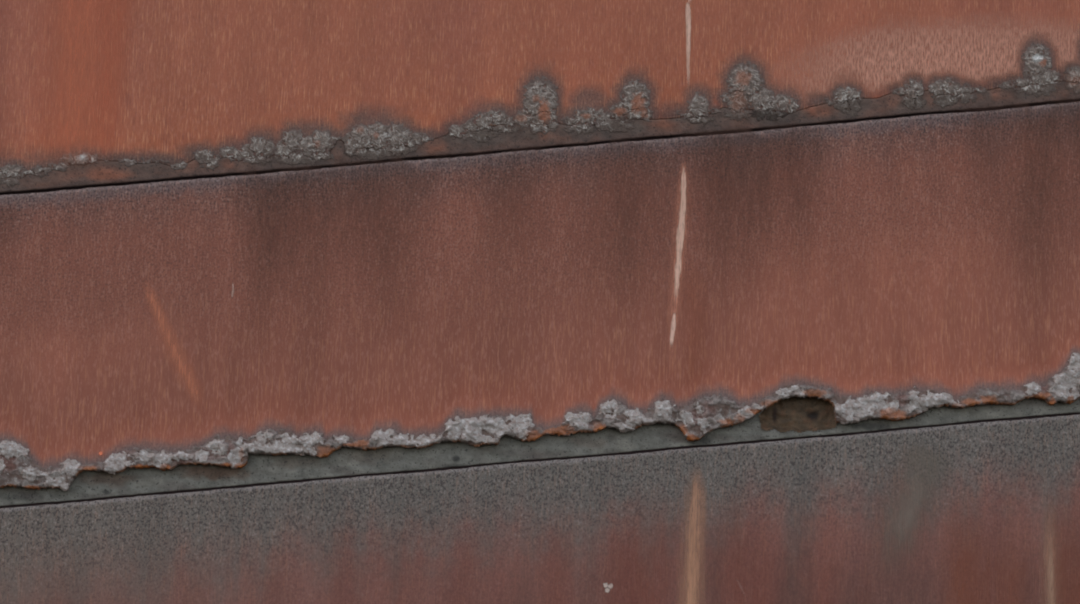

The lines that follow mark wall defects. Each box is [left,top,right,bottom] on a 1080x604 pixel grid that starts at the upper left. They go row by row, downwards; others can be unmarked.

rust [512,76,559,135]
rust [591,79,653,133]
rust [676,61,786,127]
rust [998,42,1080,98]
spalling [0,353,1080,492]
rust [684,483,701,604]
rust [1044,532,1056,604]